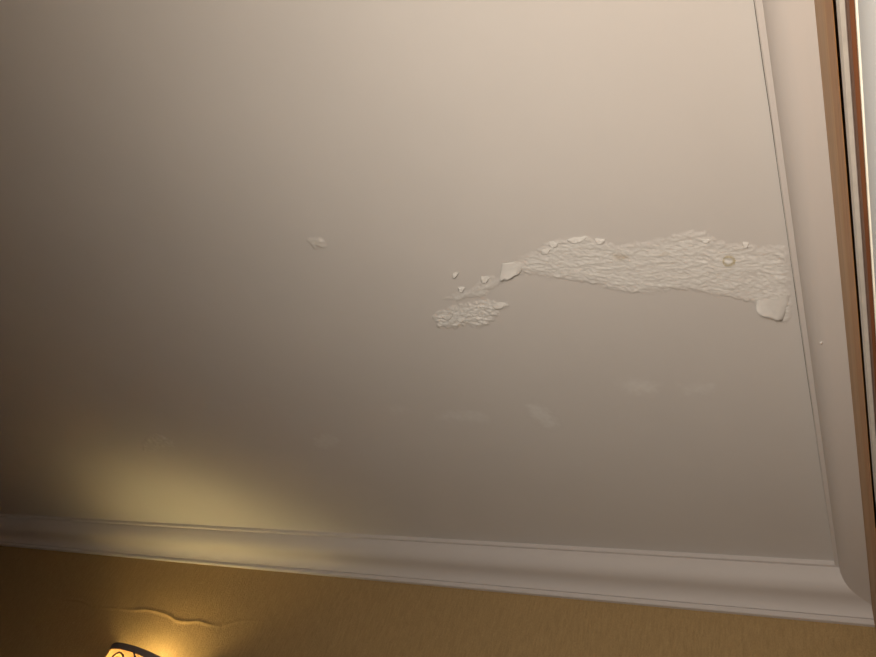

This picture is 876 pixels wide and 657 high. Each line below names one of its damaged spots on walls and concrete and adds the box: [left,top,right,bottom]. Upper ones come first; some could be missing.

peeling [430,229,796,330]